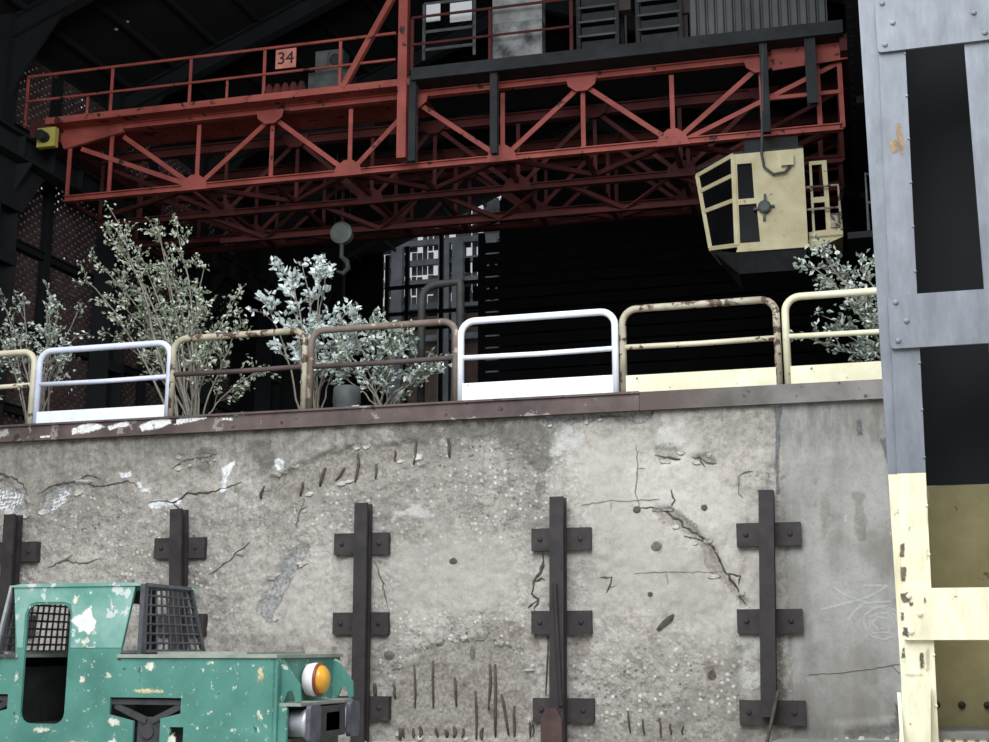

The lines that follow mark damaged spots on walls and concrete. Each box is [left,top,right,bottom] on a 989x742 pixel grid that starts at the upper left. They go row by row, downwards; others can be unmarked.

corrosion [890,123,904,154]
peeling [71,417,207,435]
crack [171,454,216,469]
spalling [0,477,92,519]
crack [0,472,241,509]
crack [583,449,750,608]